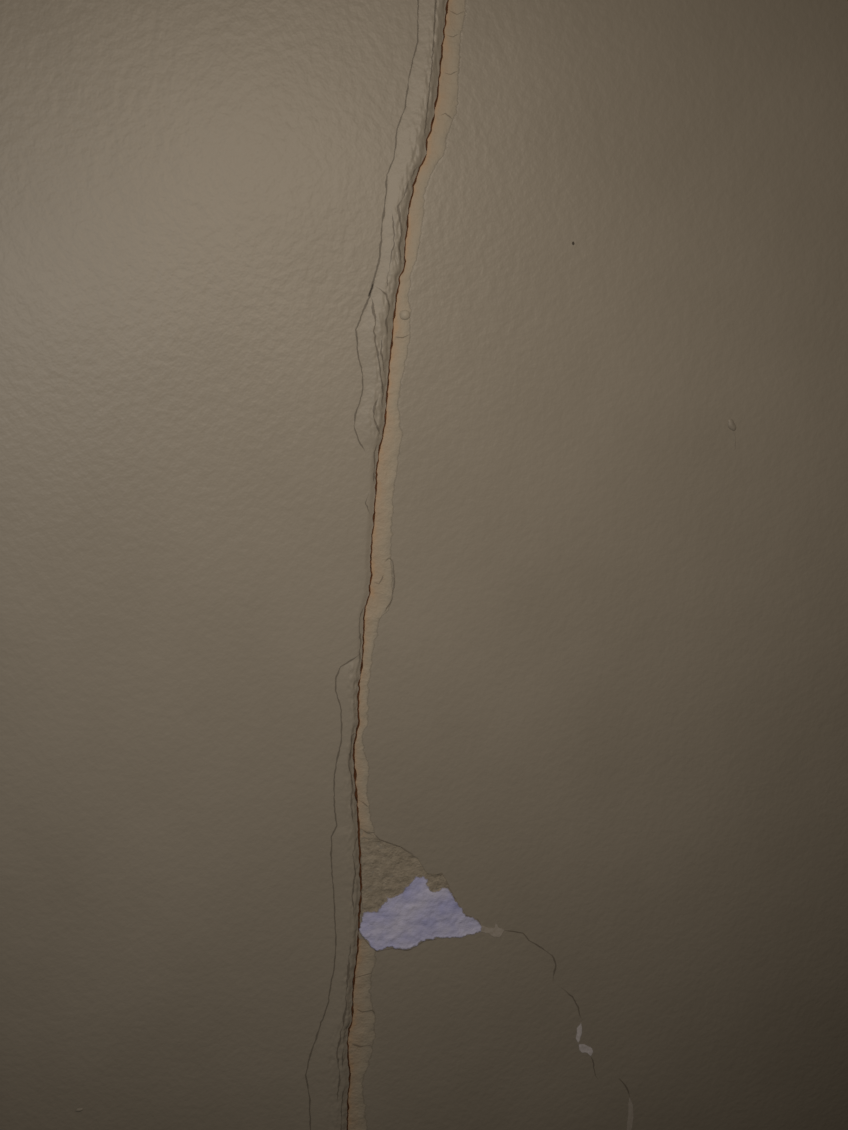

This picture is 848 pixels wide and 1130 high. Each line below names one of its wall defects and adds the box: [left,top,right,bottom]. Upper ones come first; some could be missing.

crack [347,0,466,1130]
peeling [359,829,504,950]